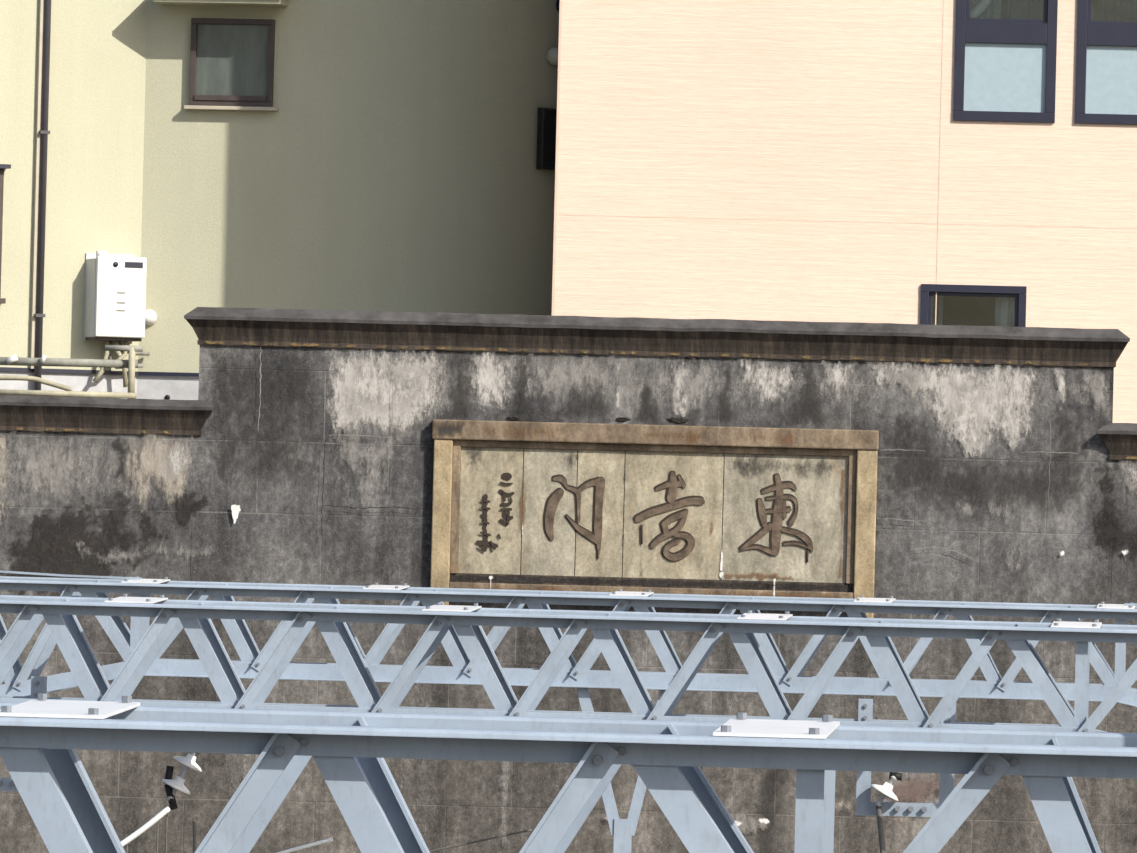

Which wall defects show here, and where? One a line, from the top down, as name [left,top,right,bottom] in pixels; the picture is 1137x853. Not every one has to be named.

leakage [328,351,1109,505]
leakage [0,434,208,595]
leakage [1092,461,1137,560]